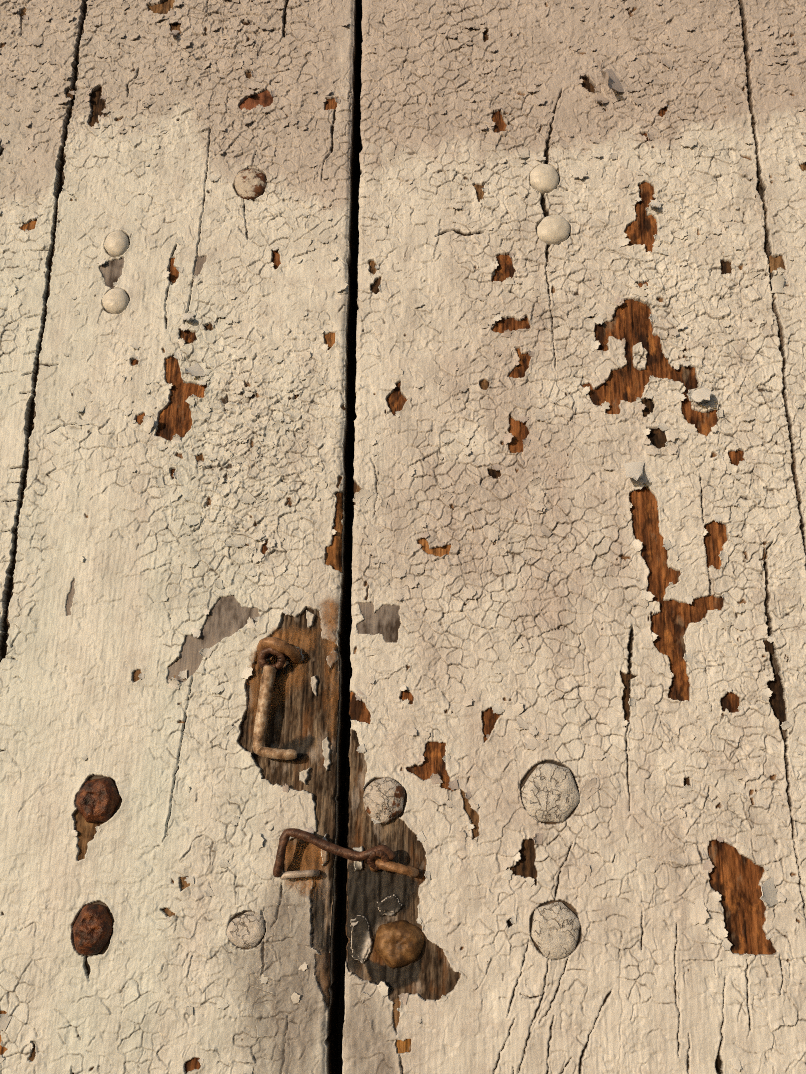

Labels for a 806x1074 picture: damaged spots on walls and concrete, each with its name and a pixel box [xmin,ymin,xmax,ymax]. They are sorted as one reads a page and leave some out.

crack [0,0,97,663]
peeling [134,313,217,445]
peeling [581,296,723,449]
crack [738,0,806,566]
peeling [623,462,729,701]
rust [251,630,311,712]
rust [323,601,339,730]
rust [285,842,325,893]
peeling [238,602,461,1053]
peeling [703,836,777,959]
crack [493,943,612,1074]
crack [715,959,751,1074]